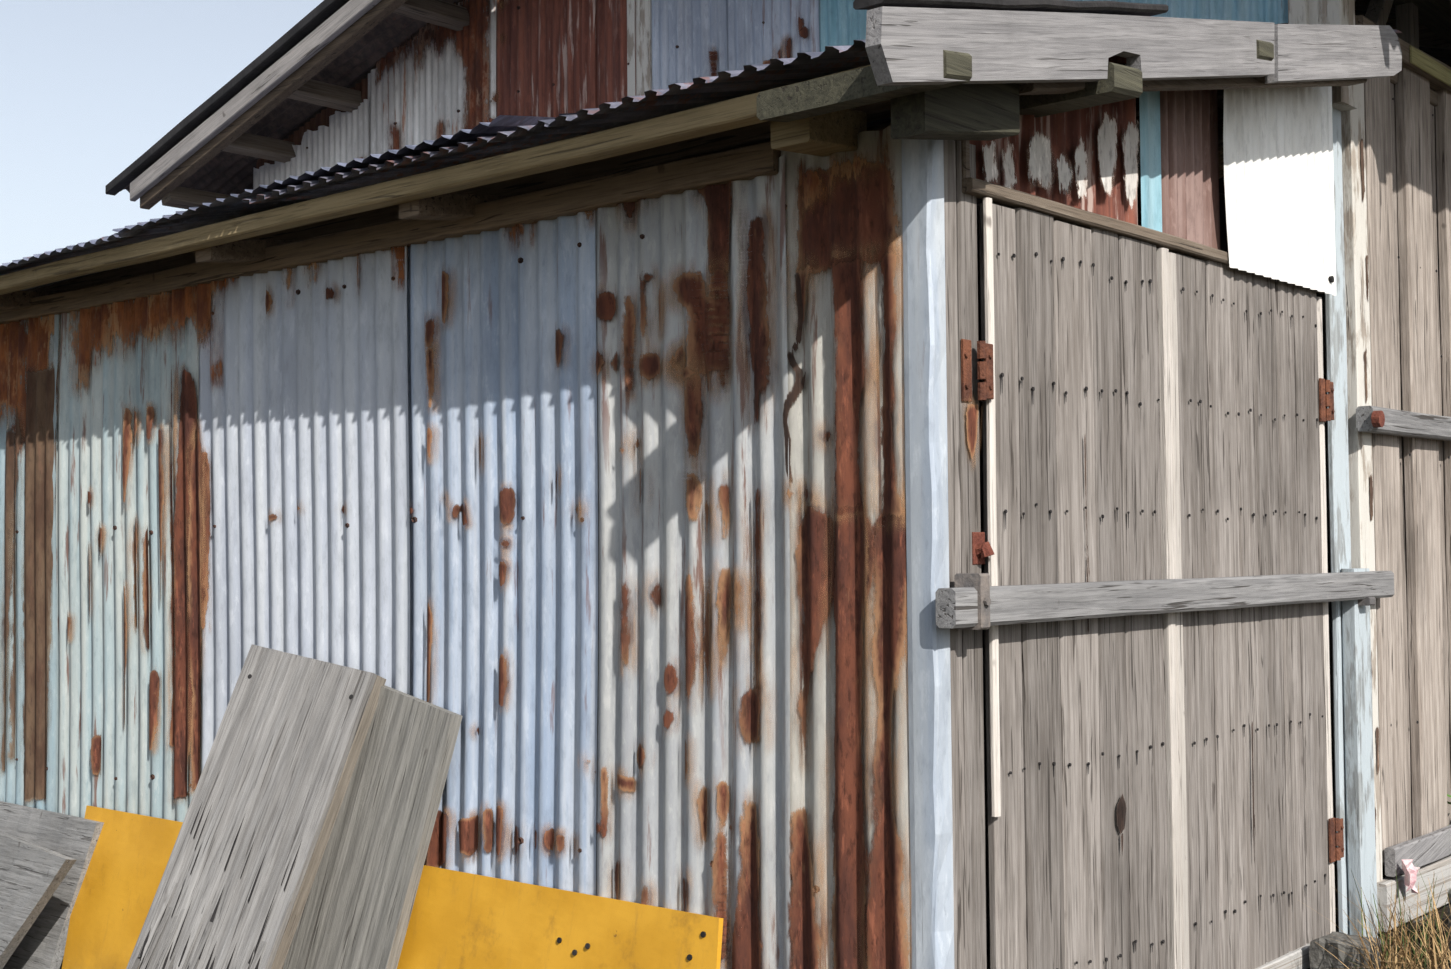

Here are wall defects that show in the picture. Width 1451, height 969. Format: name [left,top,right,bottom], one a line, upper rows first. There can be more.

rust [375,0,490,139]
peeling [982,112,1139,208]
rust [424,271,451,408]
rust [595,181,772,538]
rust [0,278,235,802]
rust [499,654,509,707]
rust [499,487,516,586]
rust [663,488,761,744]
rust [787,144,911,969]
rust [426,805,576,868]
rust [587,743,645,837]
rust [697,781,763,969]